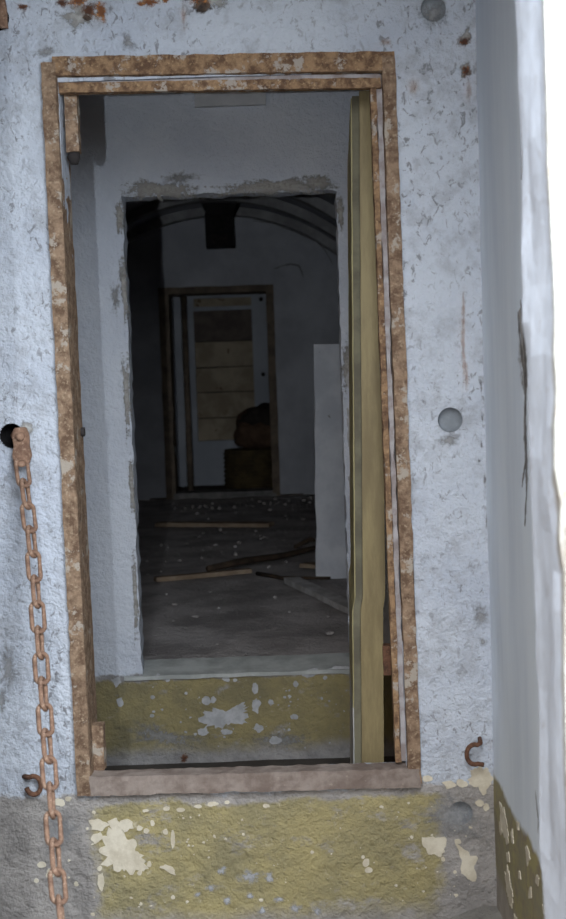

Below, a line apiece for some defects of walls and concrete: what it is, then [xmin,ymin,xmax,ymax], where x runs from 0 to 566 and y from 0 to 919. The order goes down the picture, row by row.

crack [518,300,528,526]
peeling [198,683,282,744]
peeling [89,809,175,891]
peeling [163,801,230,812]
peeling [422,767,531,919]